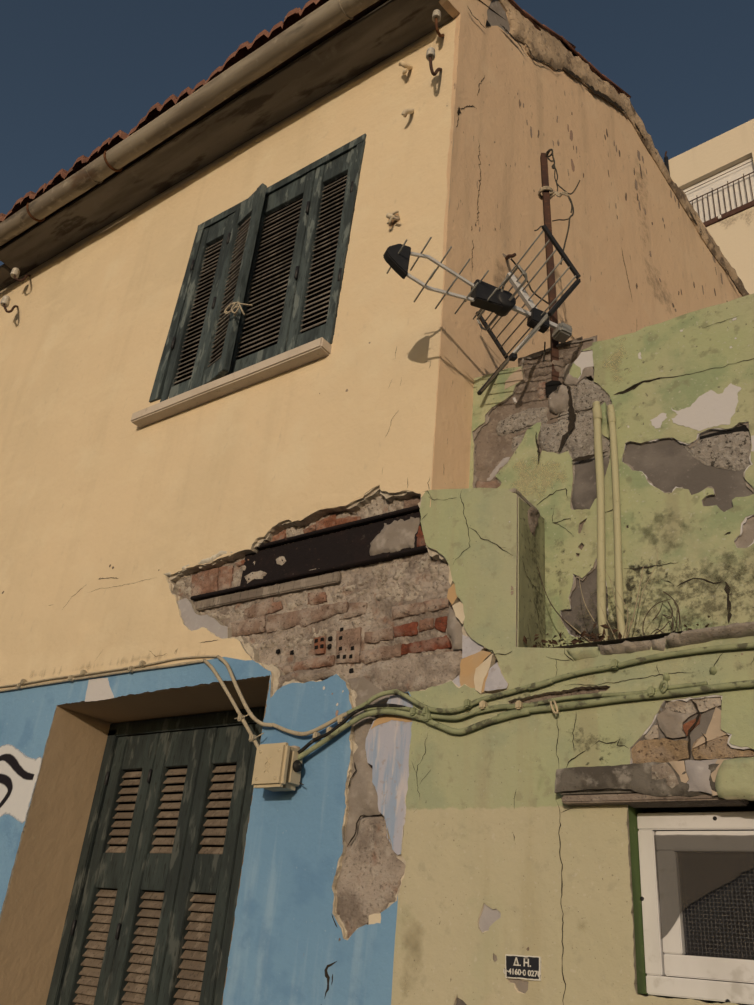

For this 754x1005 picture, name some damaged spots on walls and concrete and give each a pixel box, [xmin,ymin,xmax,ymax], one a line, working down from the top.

peeling [615,150,665,227]
flaking render [473,335,618,510]
crack [511,358,754,462]
spalling [622,384,754,512]
crack [407,479,684,685]
spalling [561,558,609,640]
crack [624,562,732,624]
spalling [158,485,509,941]
crack [556,716,628,768]
spalling [630,695,754,764]
crack [557,803,572,1005]
crack [324,961,337,996]